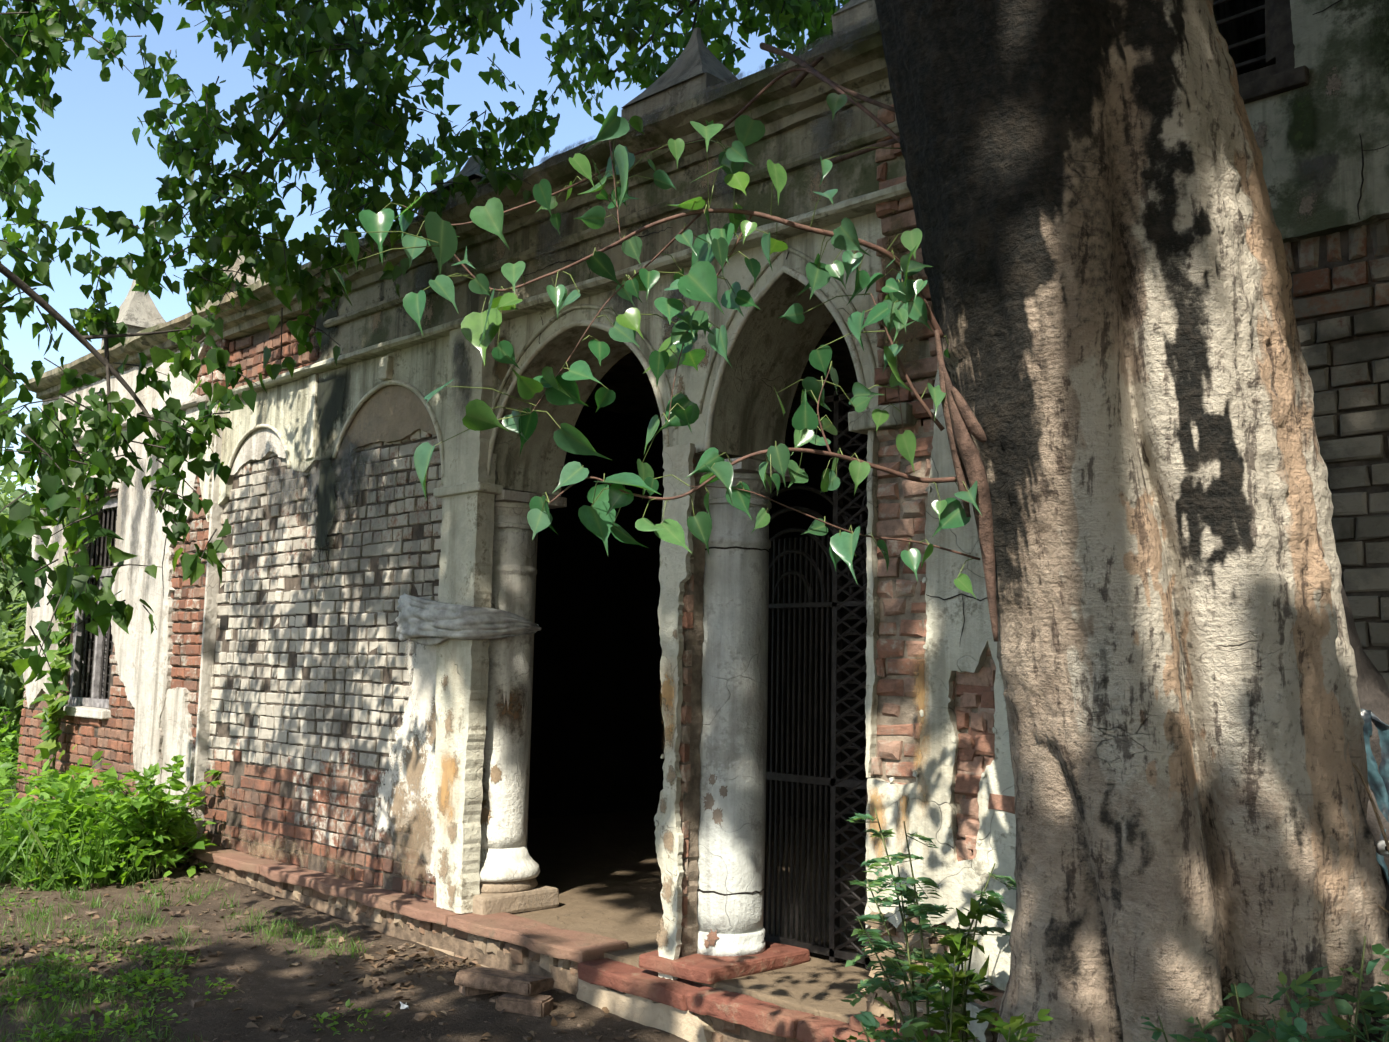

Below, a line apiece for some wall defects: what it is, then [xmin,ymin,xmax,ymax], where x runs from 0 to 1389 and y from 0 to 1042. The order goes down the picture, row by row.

spalling [220,616,228,630]
spalling [307,613,318,628]
peeling [387,675,460,908]
spalling [946,667,998,860]